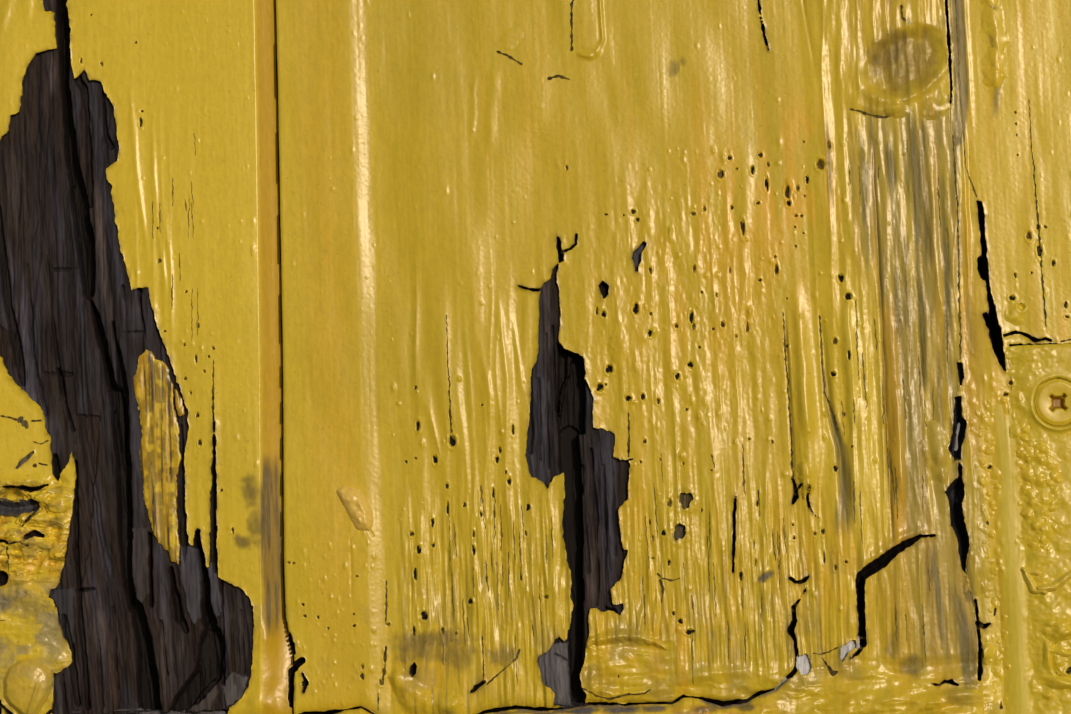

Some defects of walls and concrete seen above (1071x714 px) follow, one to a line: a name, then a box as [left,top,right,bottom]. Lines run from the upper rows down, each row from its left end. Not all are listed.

crack [758,0,769,50]
crack [850,108,890,118]
crack [937,0,1071,371]
peeling [0,0,254,714]
crack [0,415,49,572]
peeling [525,237,642,710]
crack [626,412,634,461]
crack [642,301,936,685]
crack [895,569,997,686]